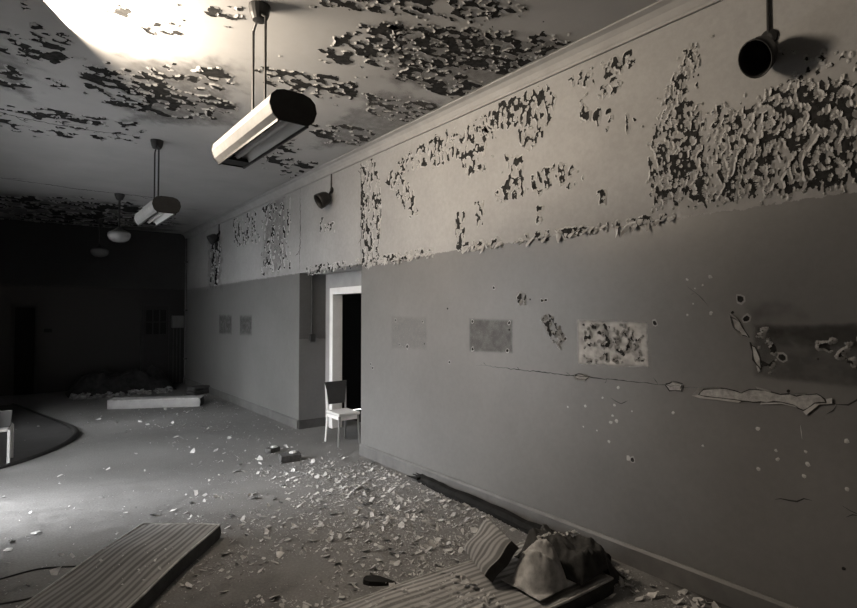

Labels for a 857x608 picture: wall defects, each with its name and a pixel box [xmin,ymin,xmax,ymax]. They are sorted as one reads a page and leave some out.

peeling [106,4,131,18]
peeling [141,19,186,36]
peeling [204,6,246,28]
peeling [255,0,571,122]
peeling [0,22,239,142]
peeling [306,43,857,276]
peeling [0,195,146,228]
peeling [540,314,567,350]
peeling [574,322,645,381]
peeling [730,294,788,375]
peeling [815,337,857,369]
crack [482,363,695,404]